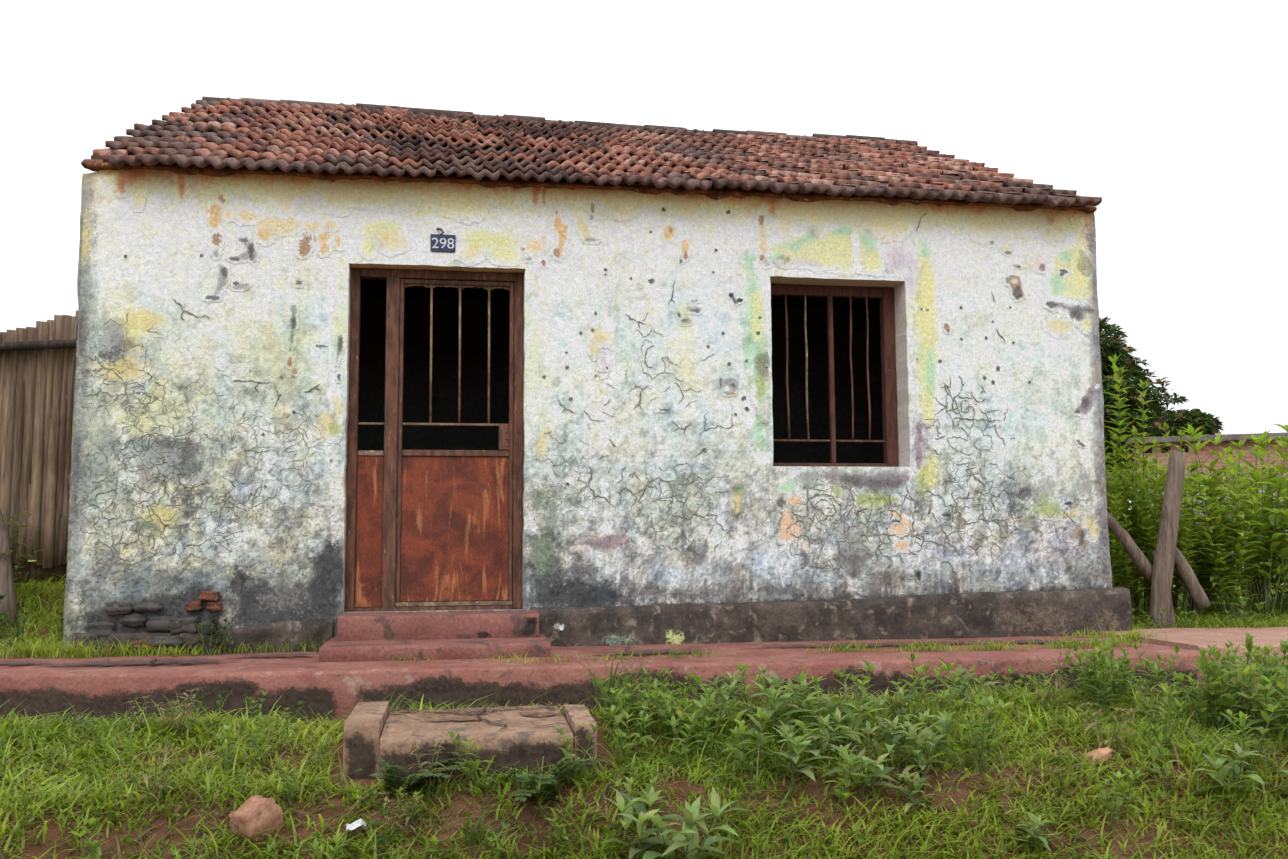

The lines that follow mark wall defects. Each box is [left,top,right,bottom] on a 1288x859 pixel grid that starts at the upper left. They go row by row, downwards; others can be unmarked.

peeling [200,193,347,303]
peeling [736,213,890,280]
damp [70,424,90,532]
spalling [76,577,232,650]
damp [133,425,216,490]
crack [75,298,324,587]
damp [216,526,343,637]
crack [527,282,737,565]
damp [524,417,1120,648]
crack [769,376,1097,599]